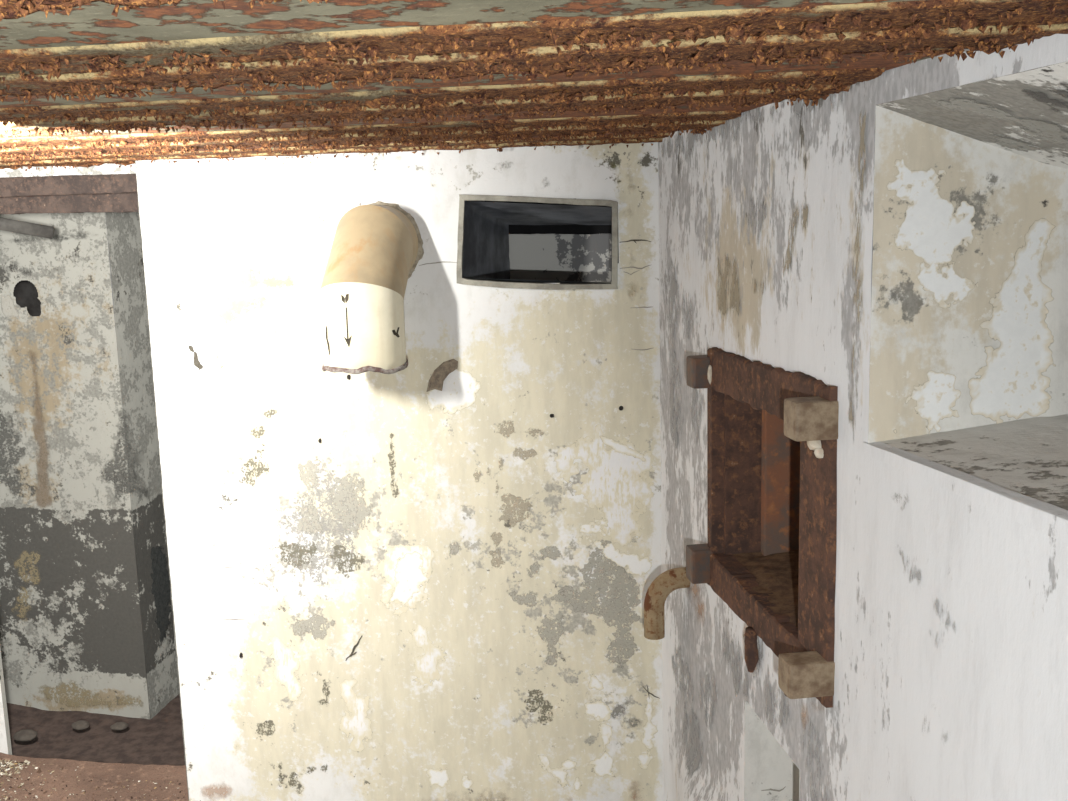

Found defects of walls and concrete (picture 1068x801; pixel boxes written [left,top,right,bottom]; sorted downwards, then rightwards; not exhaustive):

peeling [938,93,1068,151]
damp [426,369,481,414]
damp [151,546,171,642]
peeling [293,615,335,639]
damp [274,460,373,585]
damp [378,544,435,617]
peeling [474,449,537,481]
peeling [489,485,532,567]
peeling [528,546,561,577]
peeling [537,540,641,668]
damp [555,424,654,577]
damp [807,440,824,458]